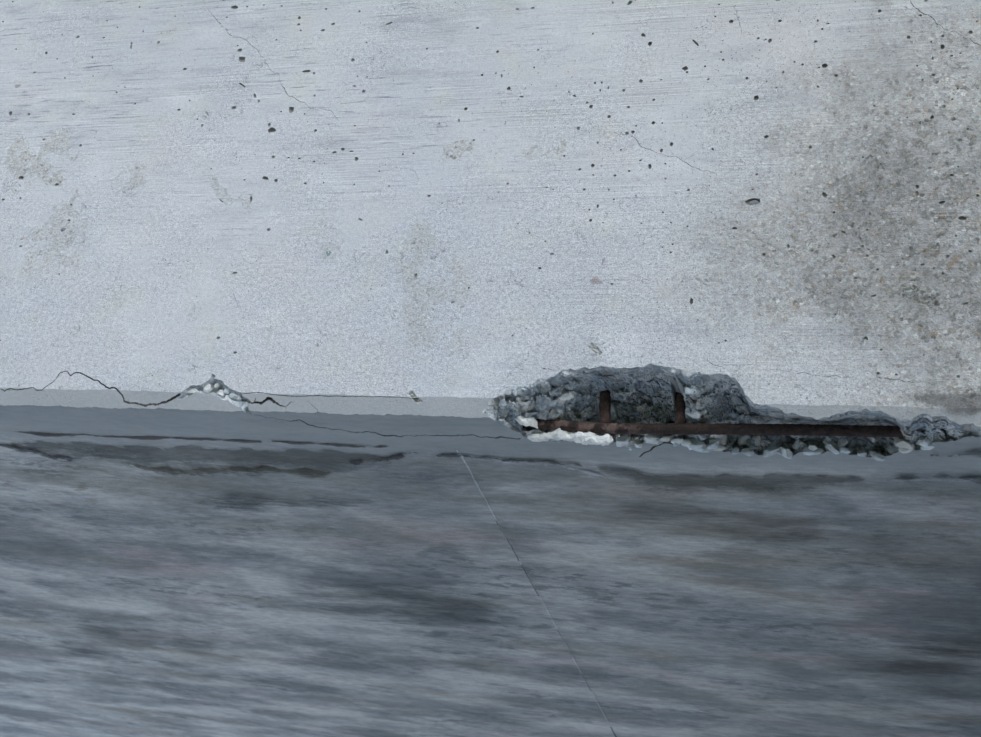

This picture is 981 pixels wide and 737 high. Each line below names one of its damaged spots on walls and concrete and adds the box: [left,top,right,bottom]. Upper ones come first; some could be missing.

crack [1,371,181,407]
crack [244,392,521,440]
spalling [483,342,981,461]